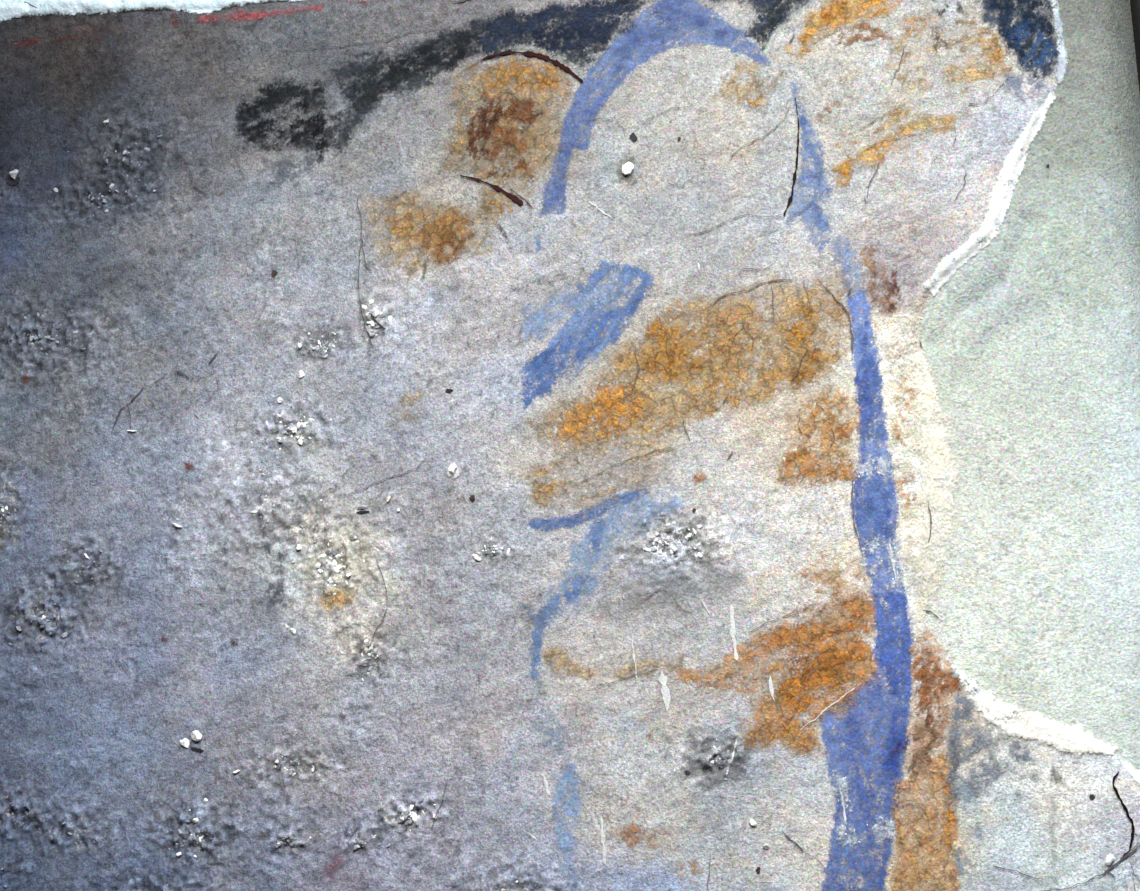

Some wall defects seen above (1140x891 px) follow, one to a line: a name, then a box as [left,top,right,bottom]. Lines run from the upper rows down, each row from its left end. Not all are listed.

flaking render [0,0,300,21]
crack [681,98,799,237]
flaking render [946,655,1140,785]
crack [994,772,1140,891]